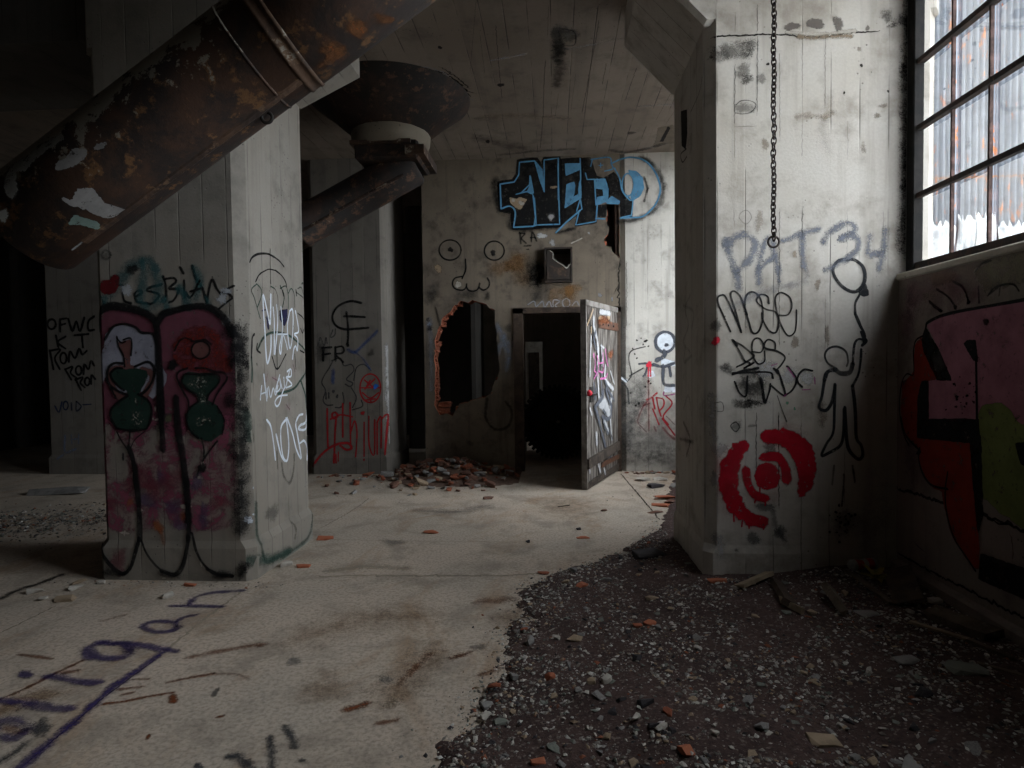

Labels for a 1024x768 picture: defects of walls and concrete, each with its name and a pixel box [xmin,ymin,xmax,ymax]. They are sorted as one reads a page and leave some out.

damp [551,27,580,87]
crack [710,5,880,124]
peeling [0,133,107,223]
peeling [62,188,125,230]
spalling [435,302,498,415]